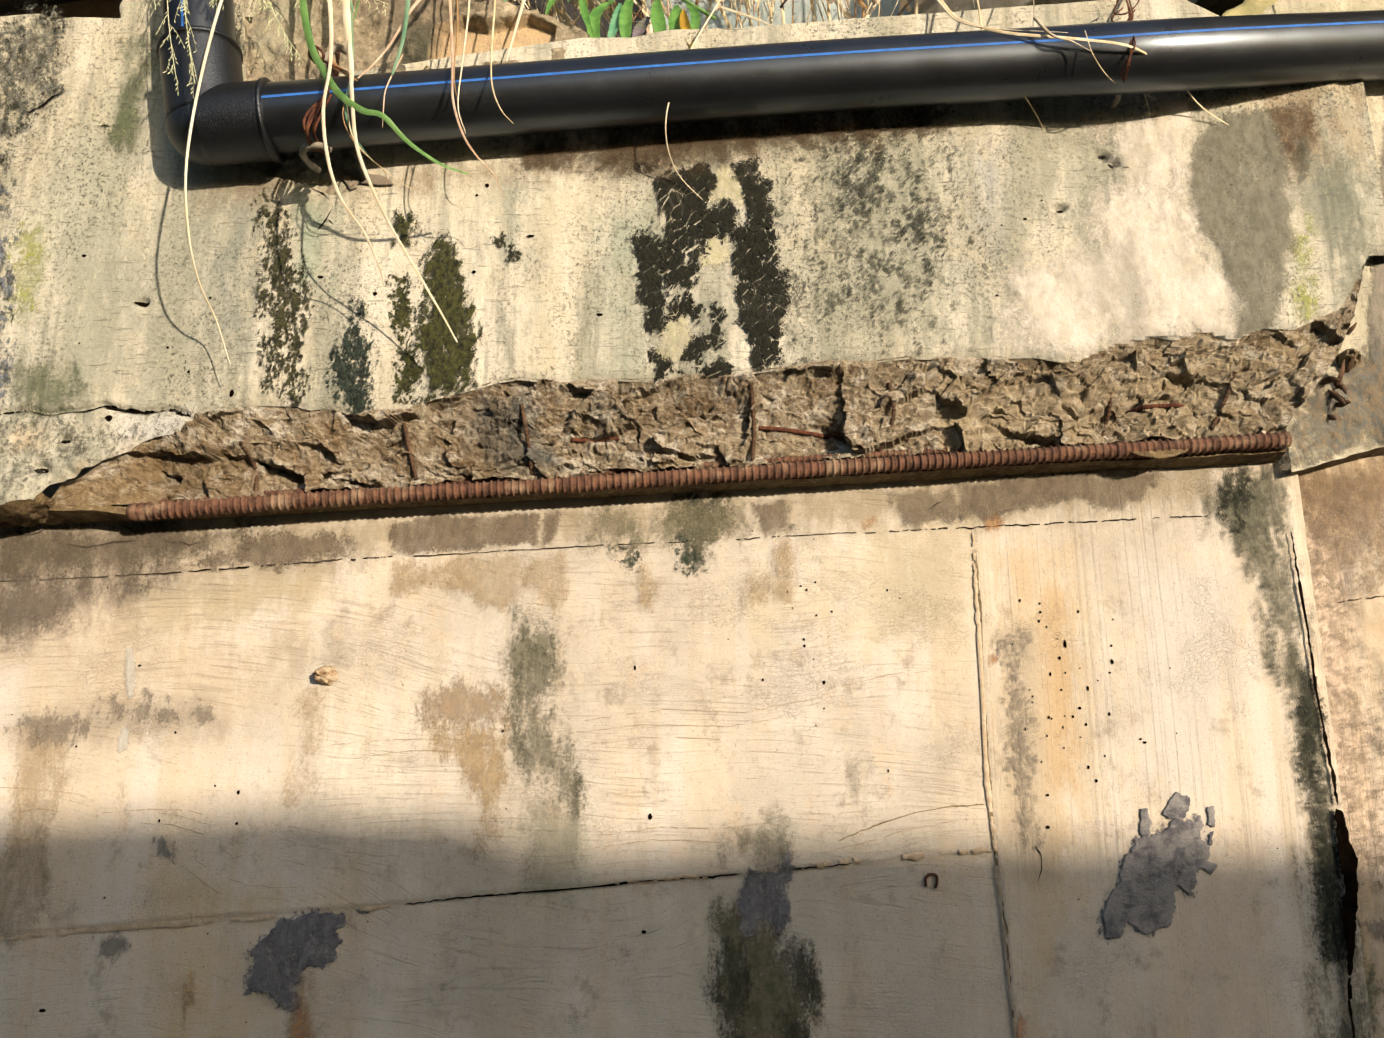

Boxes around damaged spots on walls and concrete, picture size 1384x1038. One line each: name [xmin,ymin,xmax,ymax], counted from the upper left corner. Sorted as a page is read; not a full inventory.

peeling [706,161,746,207]
peeling [700,232,729,268]
leakage [626,92,1300,383]
mould [0,180,22,415]
mould [250,188,483,417]
crack [1,402,191,417]
spalling [52,264,1364,506]
corrosion [887,382,896,427]
leakage [1217,467,1261,533]
peeling [1139,792,1217,874]
leakage [1295,666,1347,963]